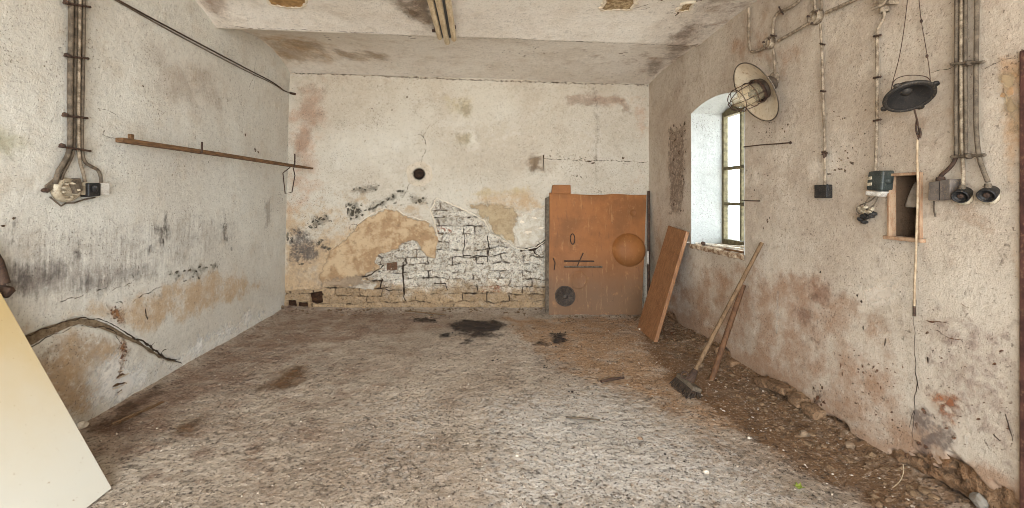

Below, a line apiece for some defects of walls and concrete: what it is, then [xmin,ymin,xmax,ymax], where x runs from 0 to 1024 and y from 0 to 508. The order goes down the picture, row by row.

spalling [597,0,648,12]
leakage [286,215,332,265]
spalling [284,198,545,308]
crack [25,317,181,363]
crack [909,323,919,437]
leakage [912,408,956,457]
rust [934,395,958,422]